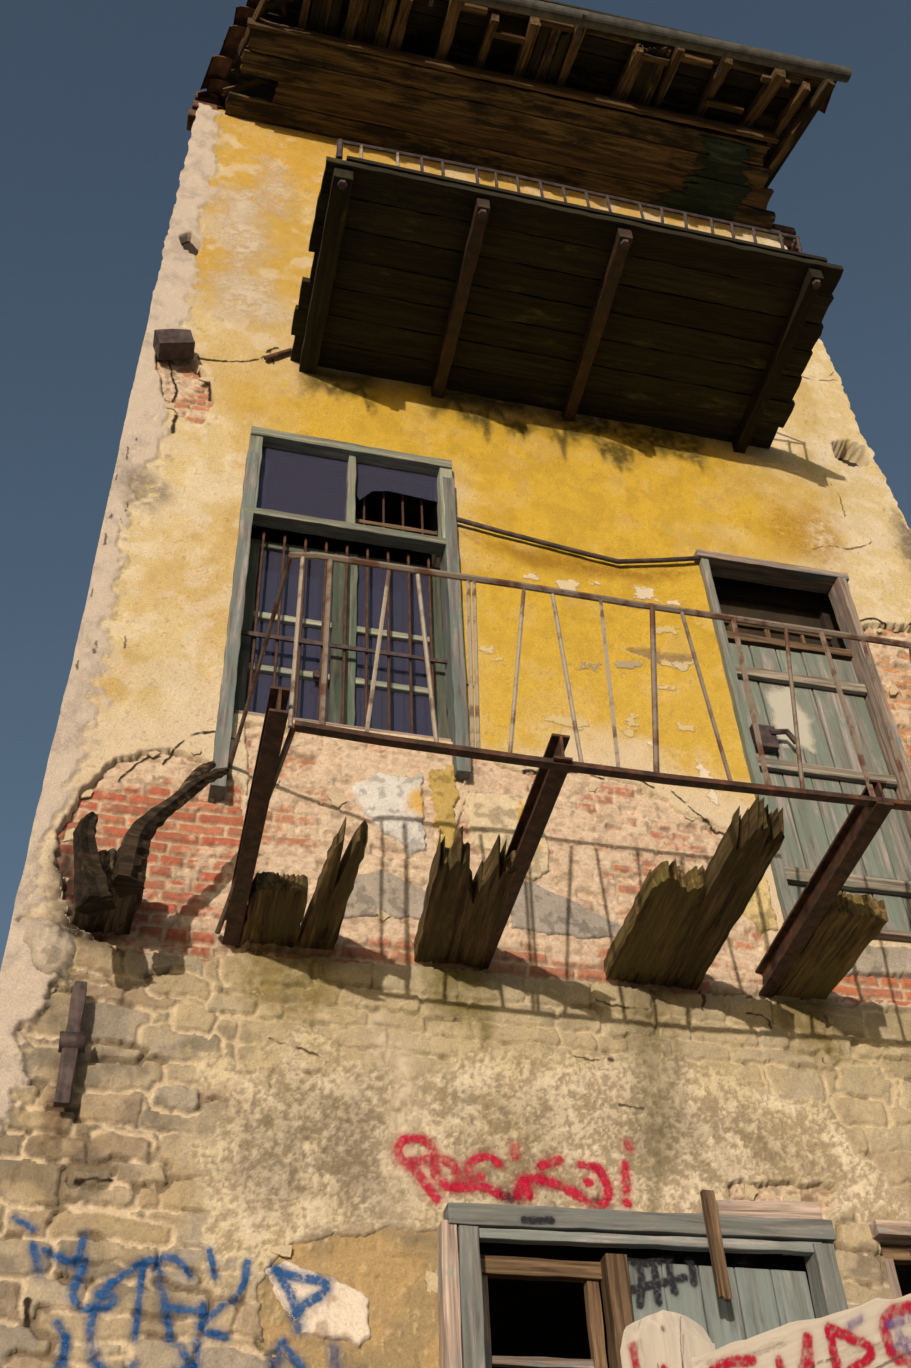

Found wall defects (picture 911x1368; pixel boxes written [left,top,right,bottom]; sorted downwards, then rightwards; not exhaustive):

spalling [156,360,215,424]
damp [437,391,527,435]
damp [548,411,701,468]
peeling [523,573,600,591]
peeling [634,586,681,609]
peeling [656,625,680,634]
spalling [578,650,694,690]
spalling [863,628,911,768]
crack [118,730,240,782]
peeling [621,713,653,751]
spalling [55,726,778,999]
spalling [829,945,911,1009]